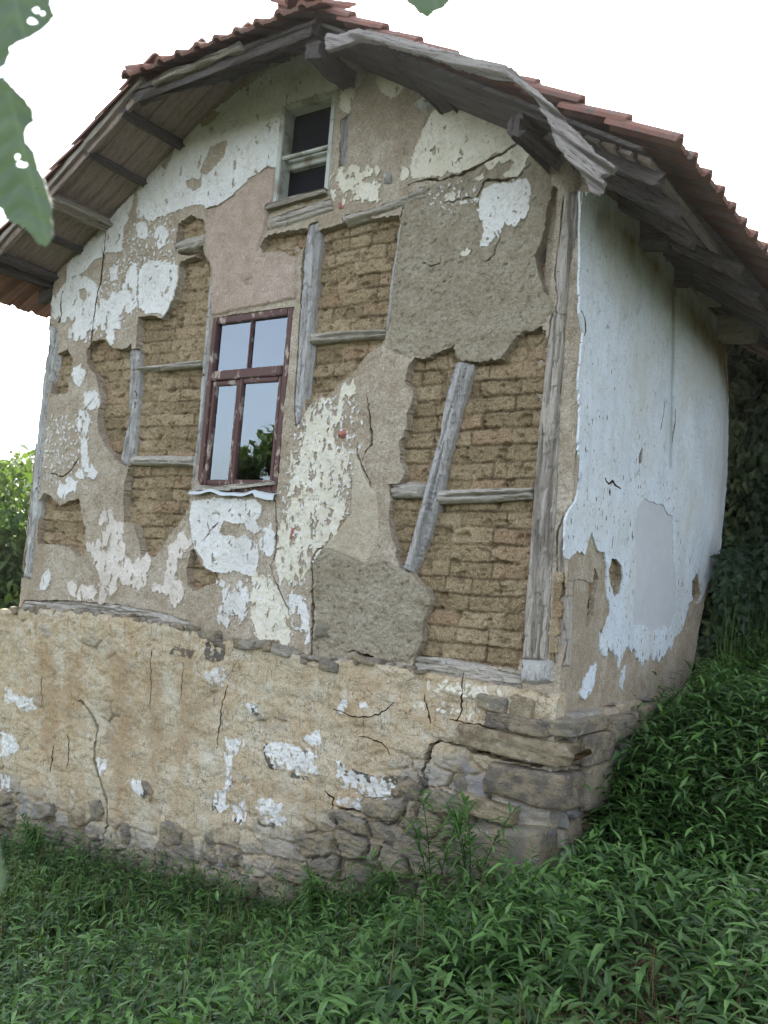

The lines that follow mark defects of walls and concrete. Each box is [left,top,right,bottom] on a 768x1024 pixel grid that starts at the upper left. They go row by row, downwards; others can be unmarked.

crack [90,232,106,359]
spalling [84,218,211,557]
spalling [227,219,400,635]
spalling [193,556,226,590]
spalling [393,498,423,565]
spalling [404,331,548,668]
spalling [549,572,565,662]
crack [146,651,154,712]
crack [216,685,228,749]
crack [333,703,394,755]
crack [424,672,543,766]
crack [572,749,592,762]